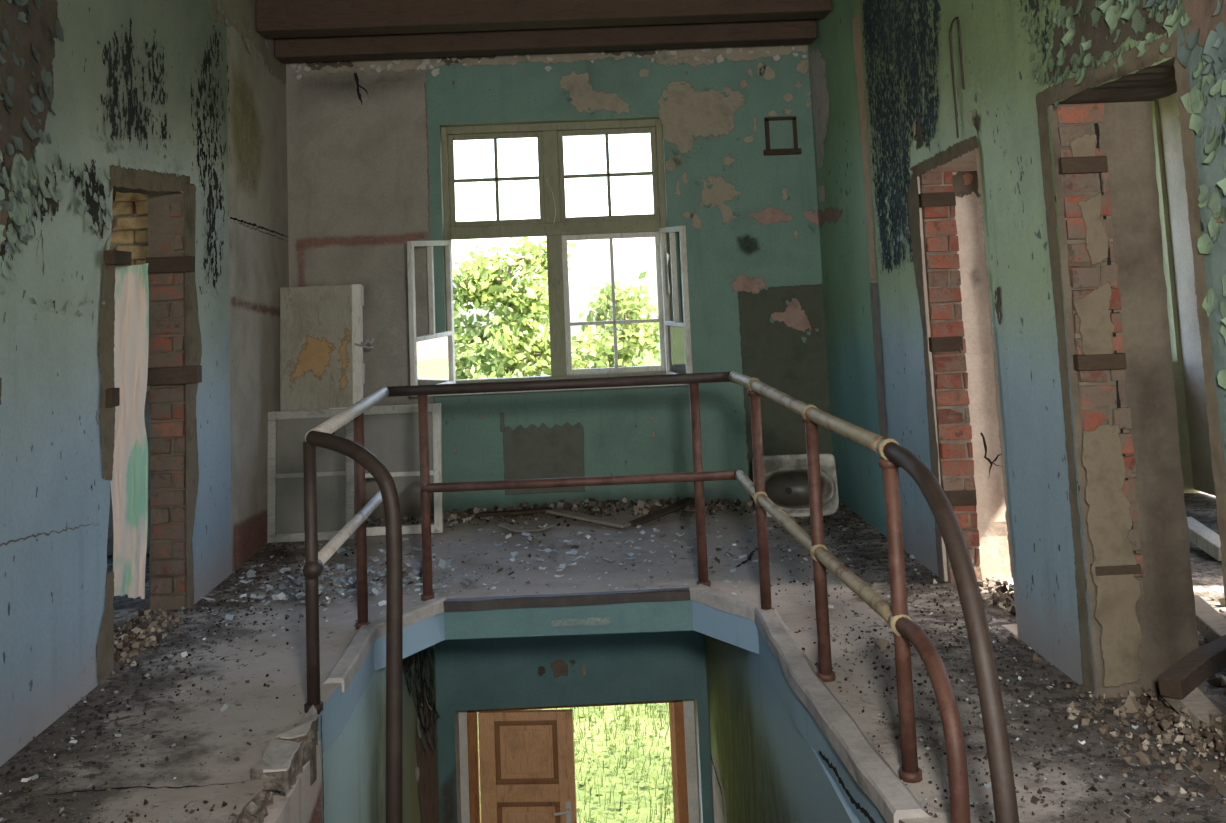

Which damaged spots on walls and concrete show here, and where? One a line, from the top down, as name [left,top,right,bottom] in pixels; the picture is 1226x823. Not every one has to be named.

peeling [0,0,843,489]
crack [0,523,100,546]
spalling [185,383,199,609]
spalling [96,571,114,685]
crack [819,751,876,823]